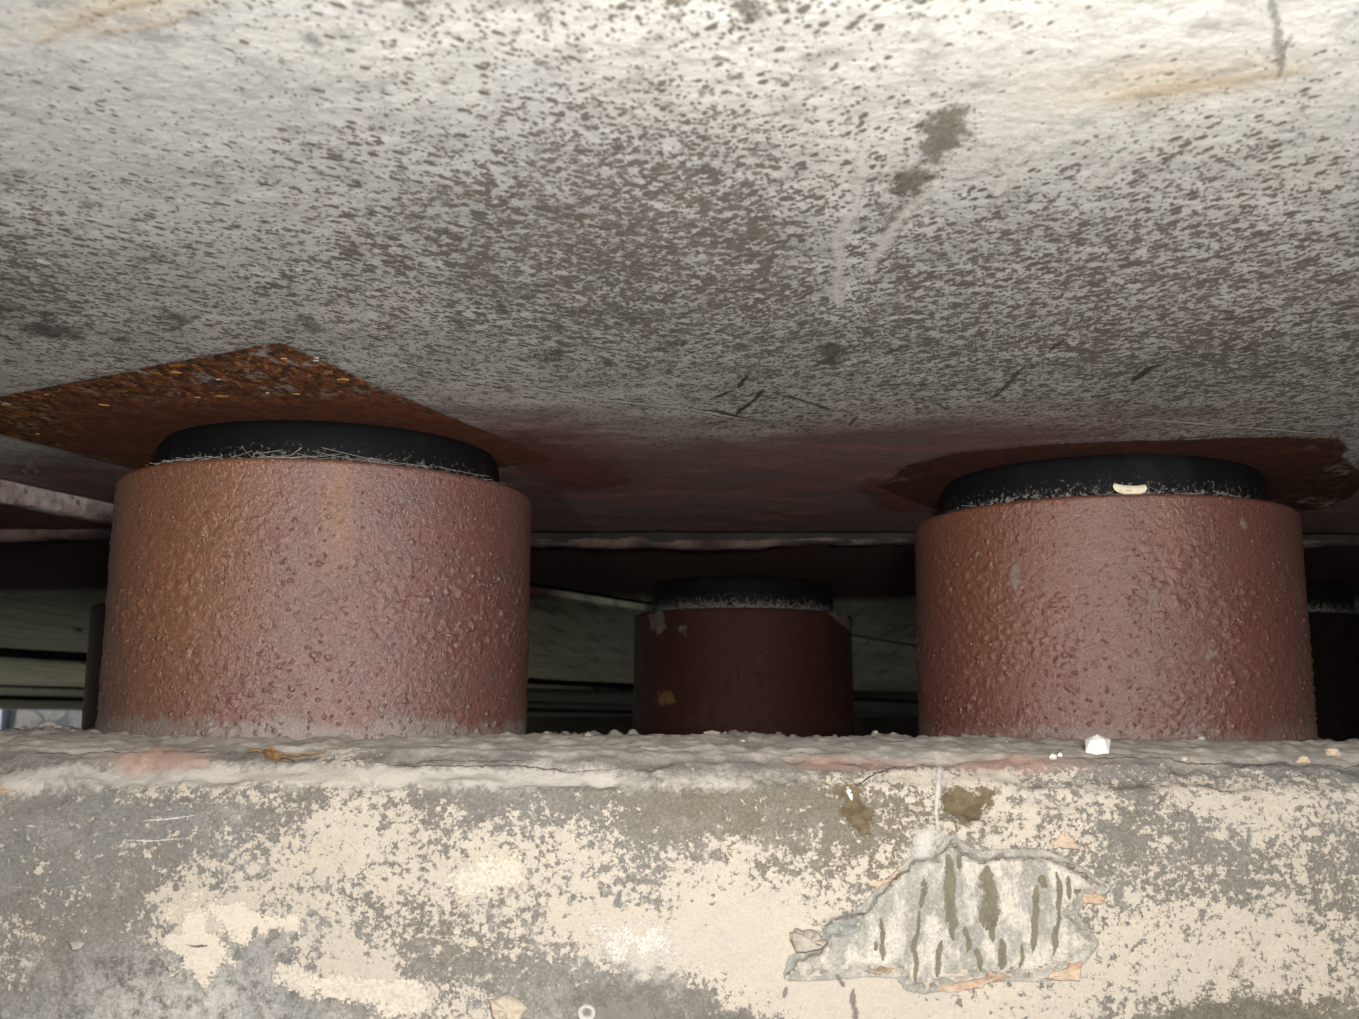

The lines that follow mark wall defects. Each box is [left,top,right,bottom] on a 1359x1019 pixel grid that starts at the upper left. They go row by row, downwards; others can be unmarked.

water stain [852,142,872,197]
water stain [1082,152,1138,190]
water stain [865,123,1042,281]
water stain [0,306,83,342]
water stain [155,310,201,330]
water stain [811,343,854,365]
spalling [784,830,1110,994]